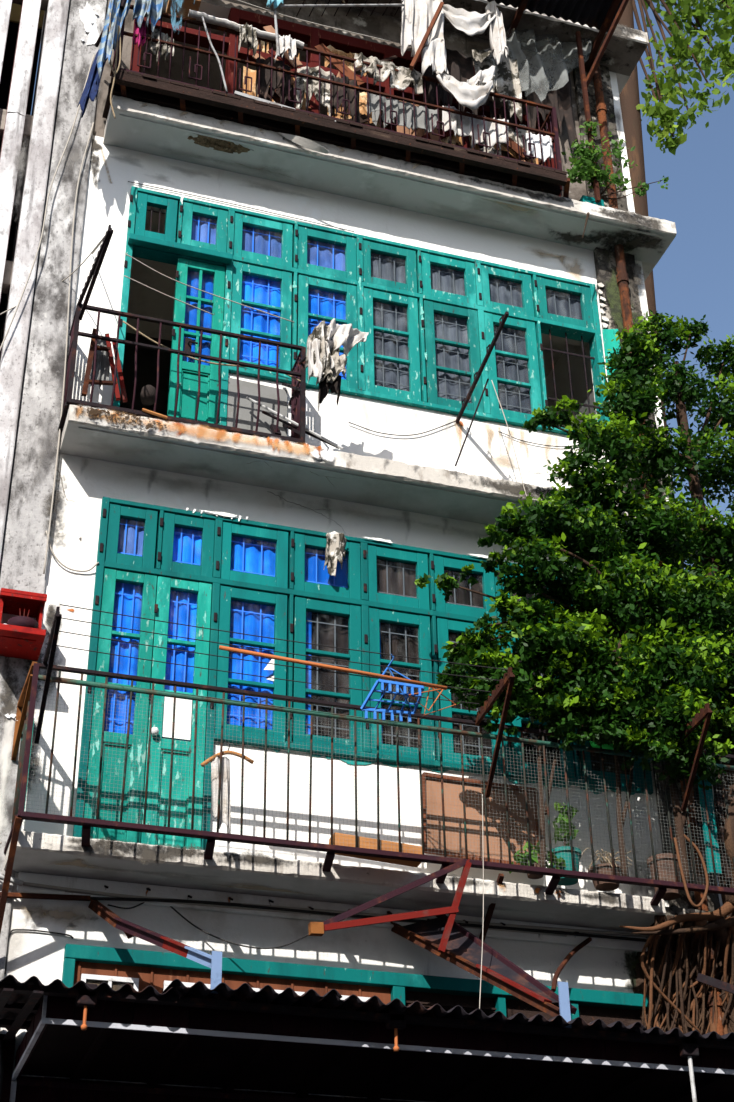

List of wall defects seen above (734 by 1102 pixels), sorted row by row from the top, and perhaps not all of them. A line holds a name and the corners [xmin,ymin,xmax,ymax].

water stain [79,76,100,119]
spalling [188,133,254,156]
water stain [64,139,112,212]
water stain [469,177,571,211]
water stain [538,252,581,276]
water stain [550,208,662,303]
rust [80,407,322,461]
water stain [39,439,65,543]
water stain [480,476,563,501]
water stain [59,838,203,868]
water stain [223,851,290,866]